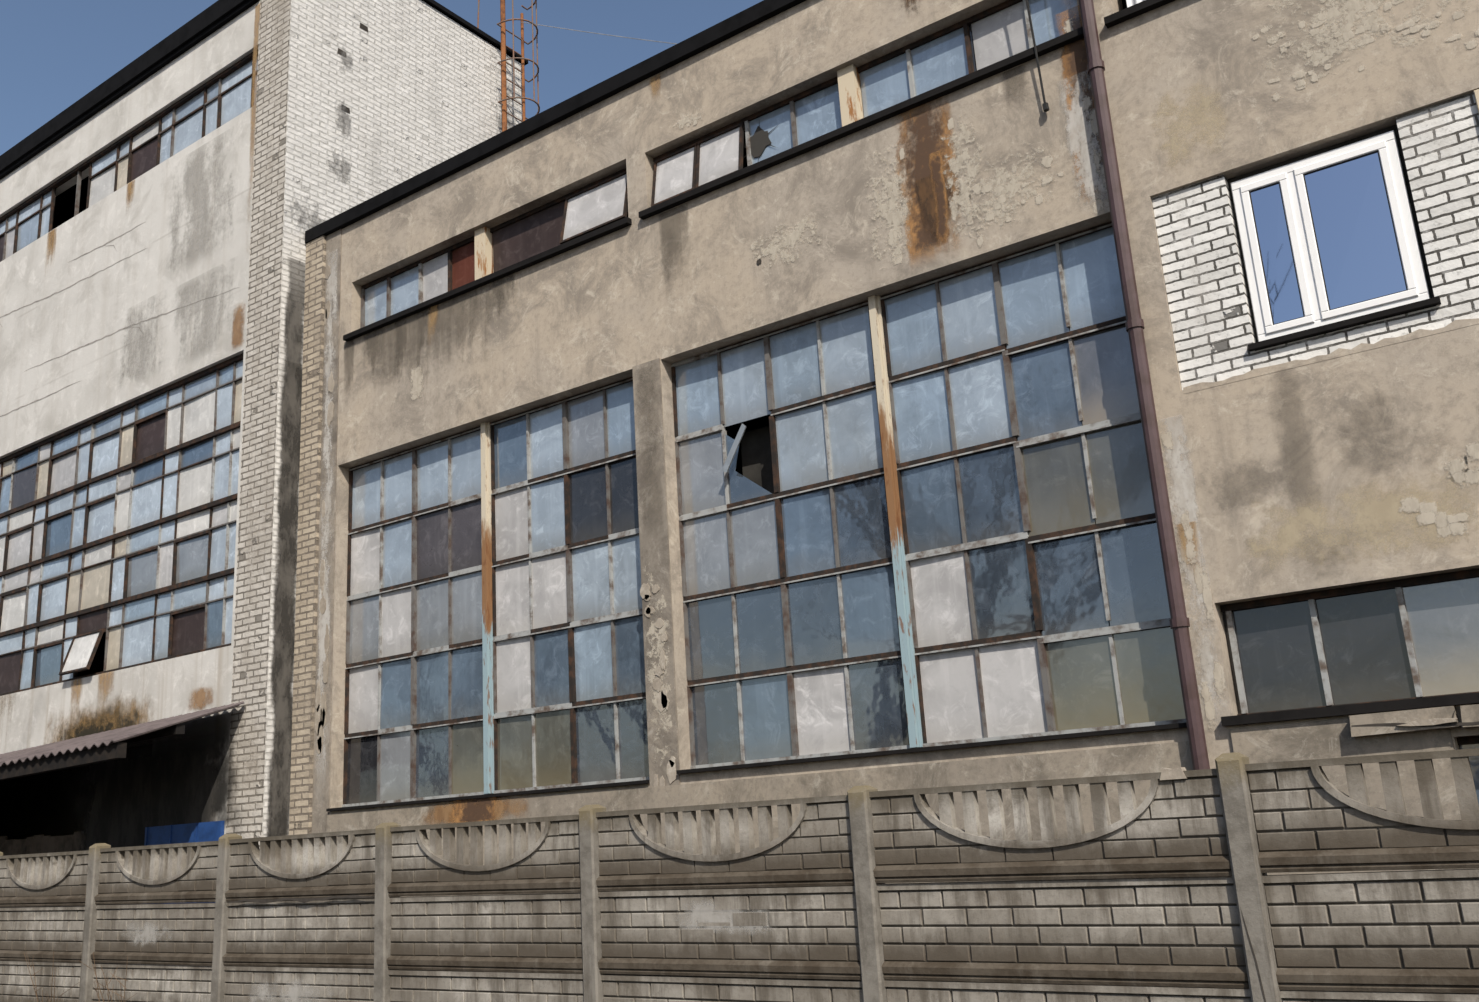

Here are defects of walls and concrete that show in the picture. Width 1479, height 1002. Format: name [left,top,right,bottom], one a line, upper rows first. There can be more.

rust [897,105,958,257]
rust [1059,8,1107,214]
peeling [1252,0,1479,101]
peeling [1399,497,1475,538]
peeling [1445,443,1479,488]
water stain [267,370,302,837]
flaking render [640,570,676,787]
spalling [1397,718,1458,726]